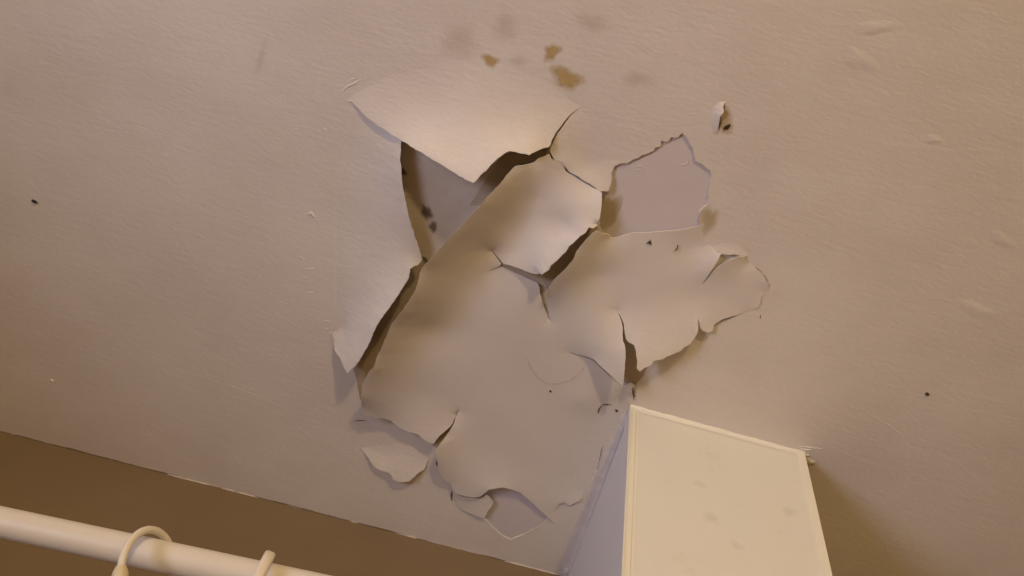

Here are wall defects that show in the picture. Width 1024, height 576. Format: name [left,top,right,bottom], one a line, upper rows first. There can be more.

peeling [332,59,769,541]